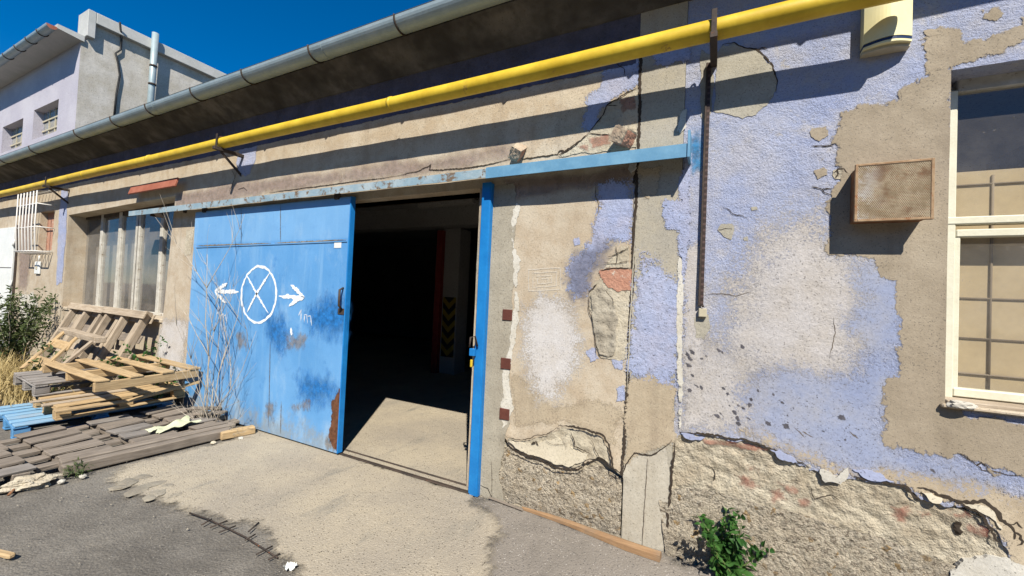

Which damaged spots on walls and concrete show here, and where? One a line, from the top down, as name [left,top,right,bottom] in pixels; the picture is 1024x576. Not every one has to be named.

crack [229,150,568,193]
peeling [500,7,1024,576]
crack [507,58,1024,545]